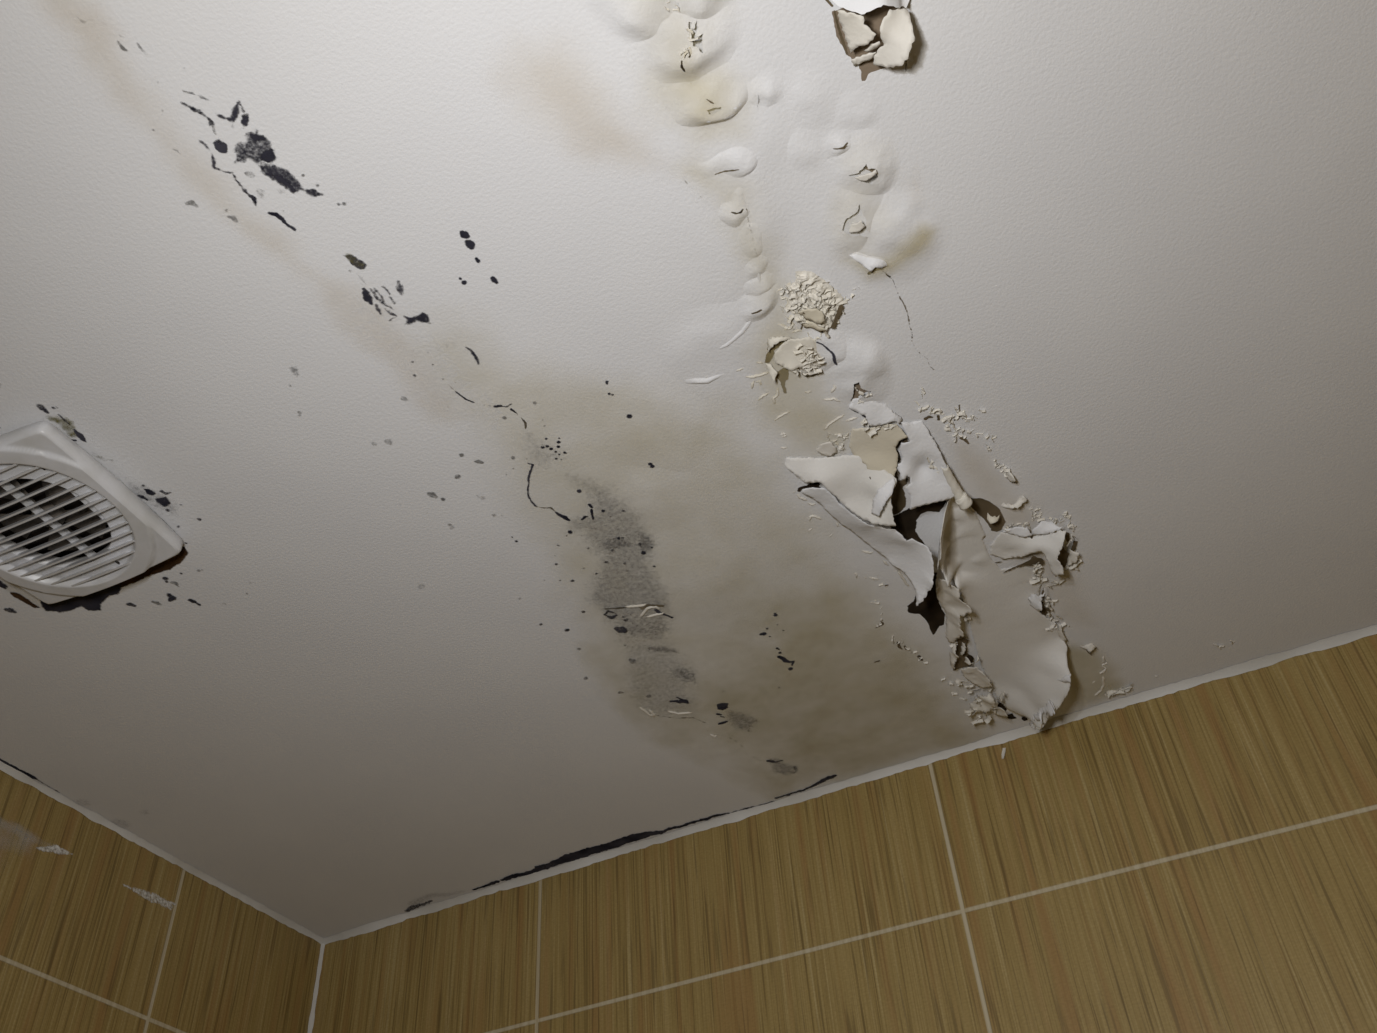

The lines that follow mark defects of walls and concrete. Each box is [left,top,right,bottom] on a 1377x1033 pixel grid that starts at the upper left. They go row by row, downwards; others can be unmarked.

peeling [736,270,1082,730]
leakage [603,604,673,633]
leakage [760,613,795,670]
leakage [659,775,837,834]
leakage [472,863,553,890]